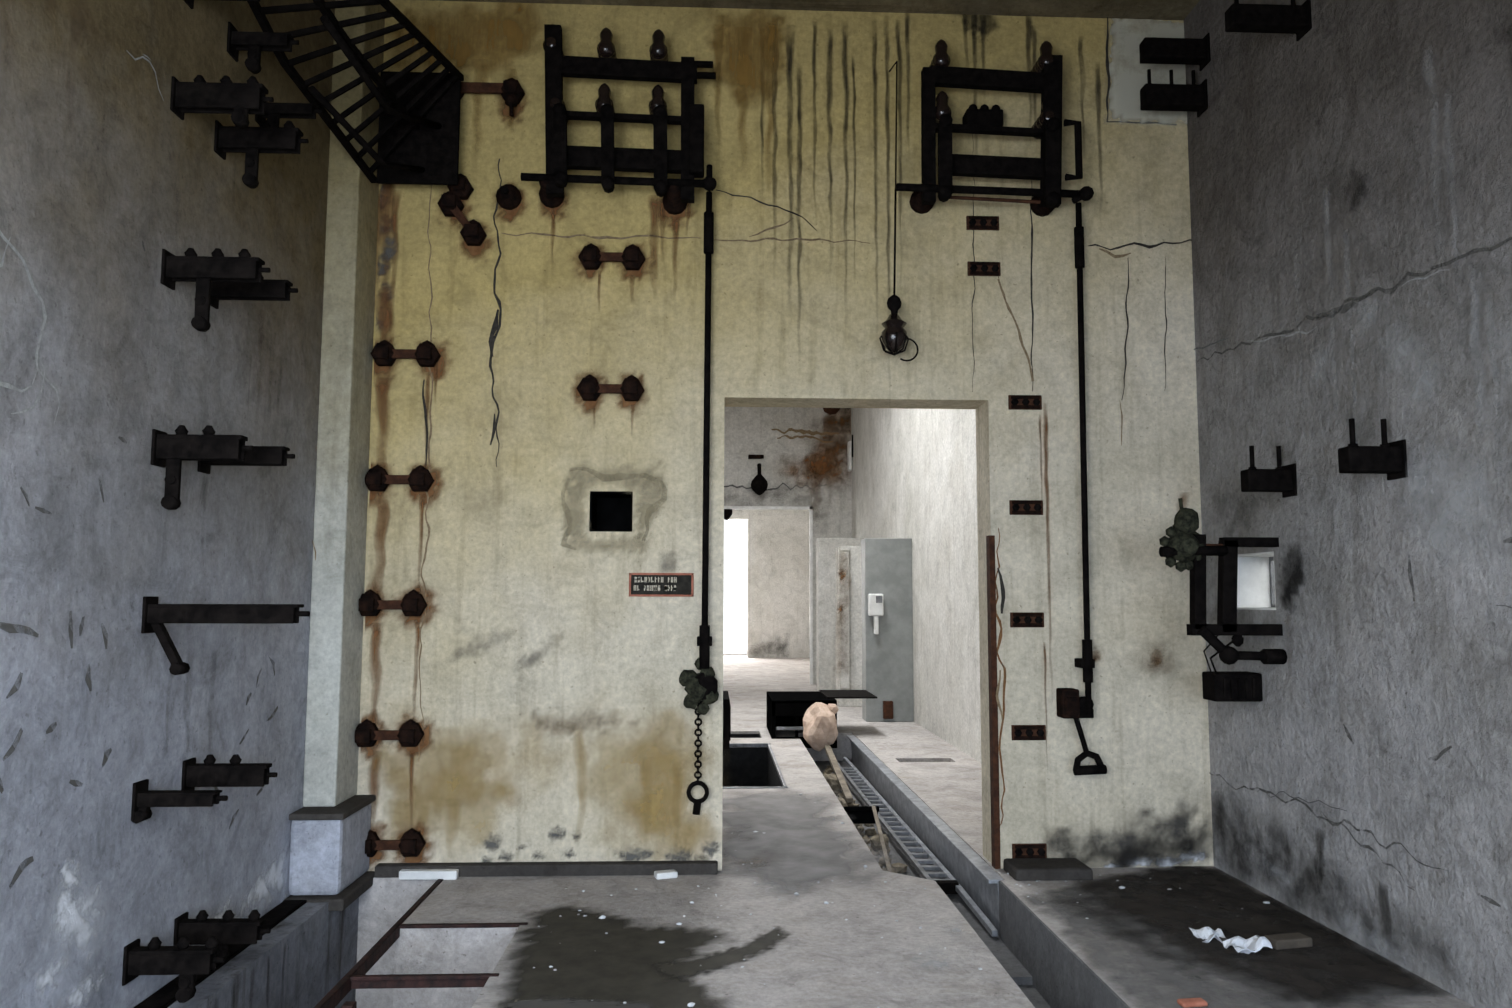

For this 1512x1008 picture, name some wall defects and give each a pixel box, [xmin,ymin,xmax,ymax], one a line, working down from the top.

water stain [711,16,856,171]
water stain [873,18,909,171]
rust [374,286,394,436]
crack [488,159,870,467]
crack [1088,237,1512,446]
rust [409,464,443,546]
peeling [637,478,662,546]
rust [790,408,851,490]
rust [365,586,435,683]
rust [360,713,431,798]
water stain [1049,802,1341,915]
water stain [499,907,789,1008]